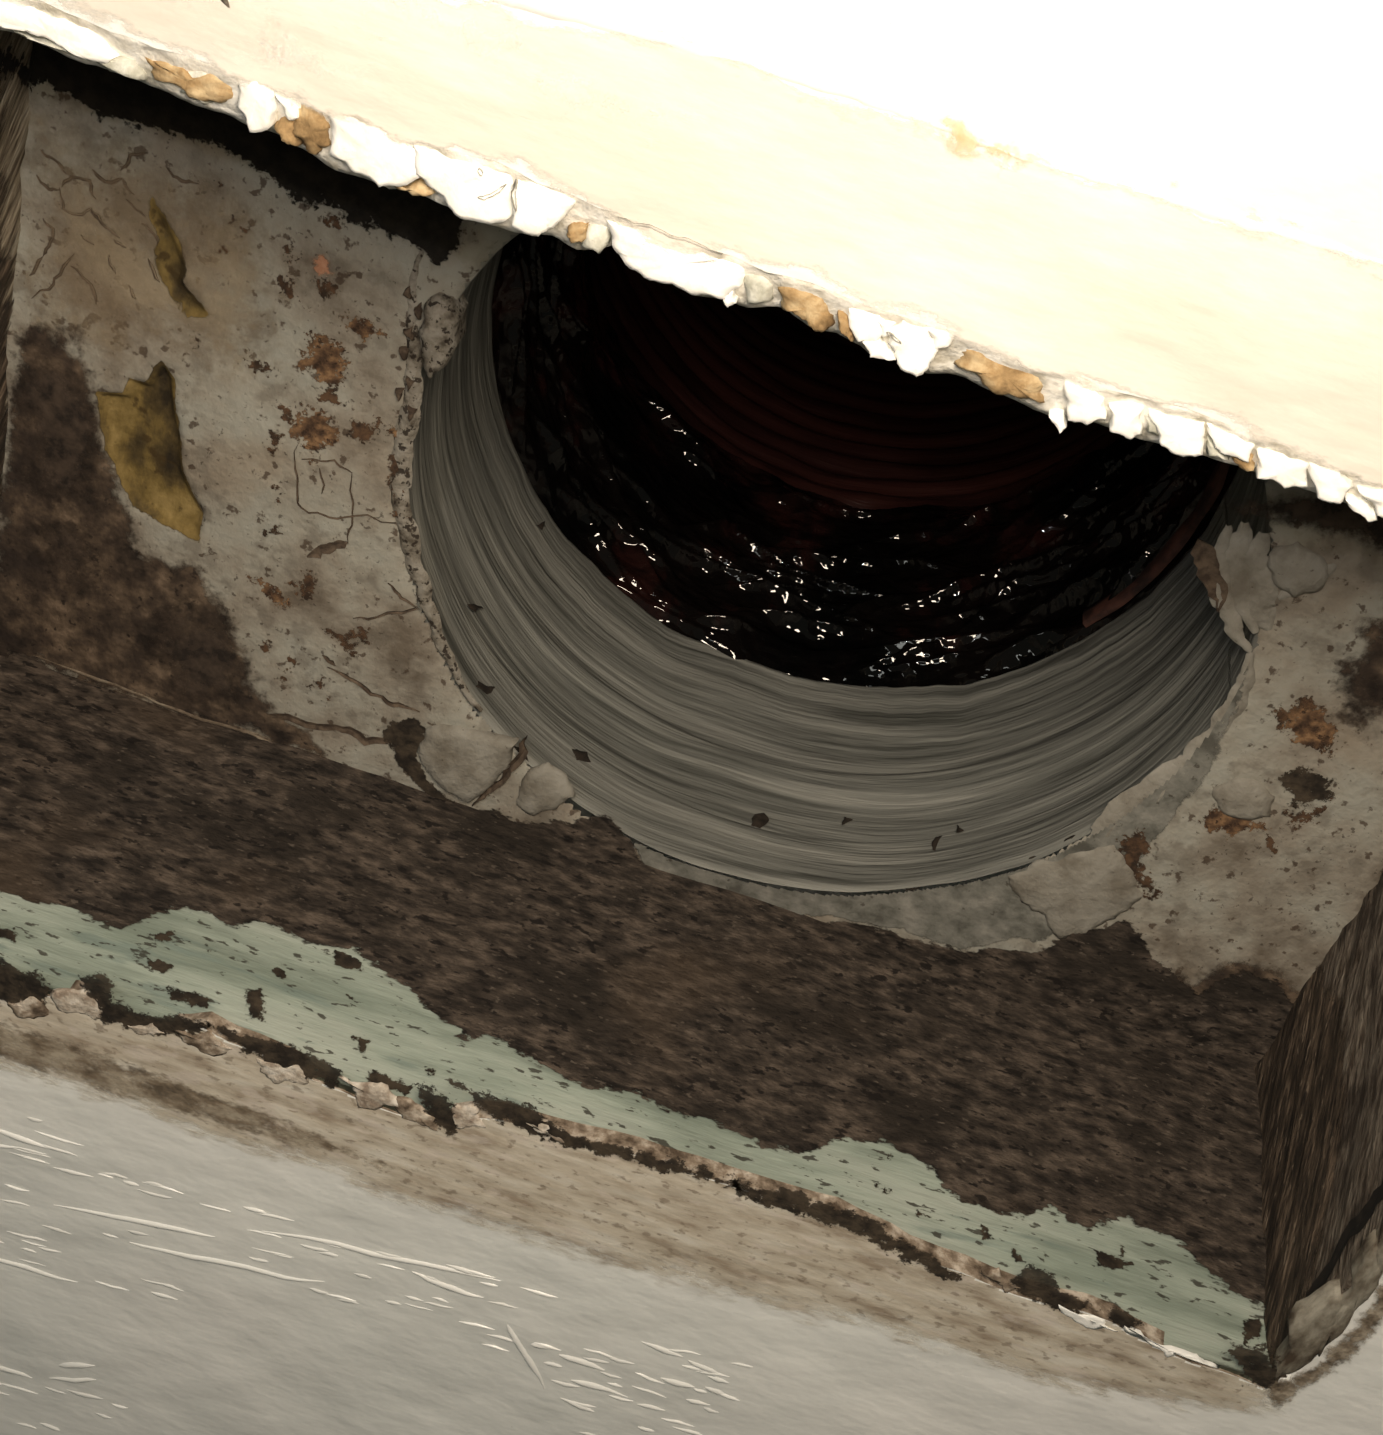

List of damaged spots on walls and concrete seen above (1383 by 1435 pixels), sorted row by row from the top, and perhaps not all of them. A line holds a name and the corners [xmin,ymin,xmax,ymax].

crack [29,149,199,305]
water stain [0,41,463,266]
rust [277,244,338,302]
peeling [0,0,1383,541]
water stain [945,119,976,151]
rust [244,358,279,378]
rust [267,309,397,465]
water stain [1232,496,1383,550]
water stain [0,234,1347,1411]
rust [1116,828,1163,901]
rust [1198,695,1338,857]
spalling [0,956,1383,1406]